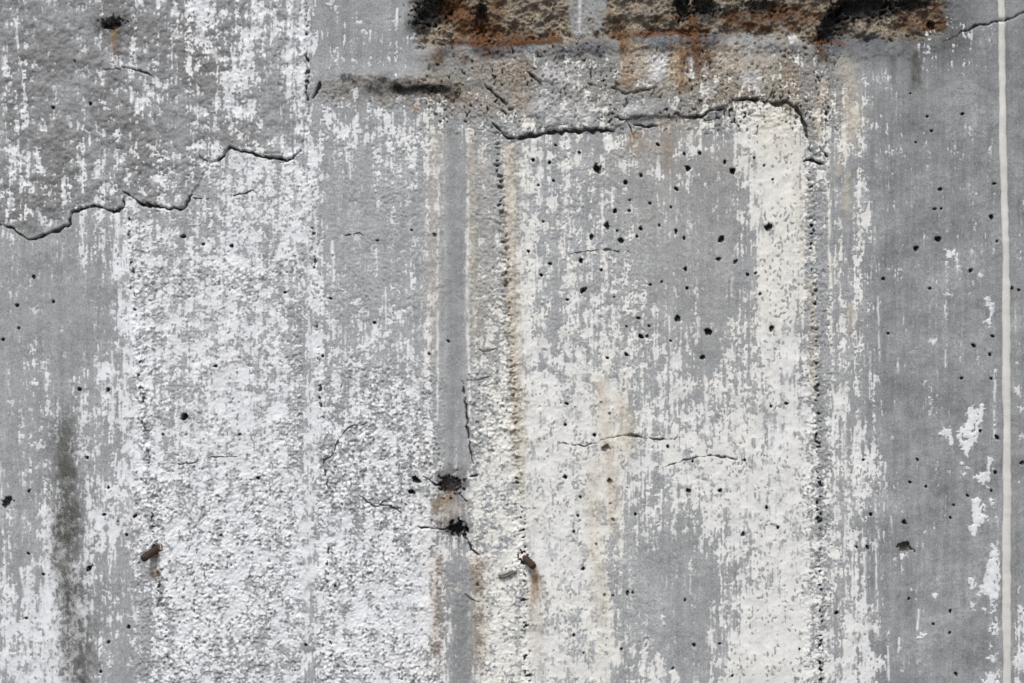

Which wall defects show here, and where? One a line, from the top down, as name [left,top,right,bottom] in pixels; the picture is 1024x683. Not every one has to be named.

rust [442,0,561,54]
crack [943,13,1023,42]
damp [370,78,460,101]
crack [486,69,828,165]
crack [199,146,296,162]
crack [0,190,252,240]
damp [54,431,80,593]